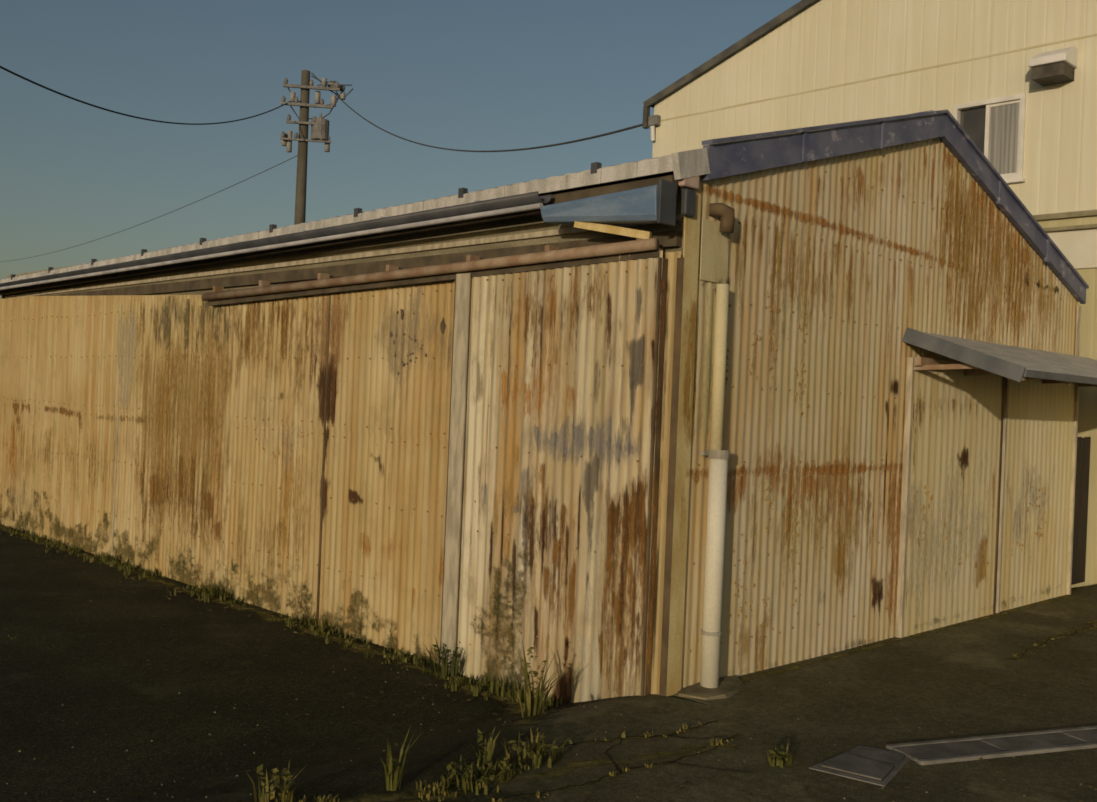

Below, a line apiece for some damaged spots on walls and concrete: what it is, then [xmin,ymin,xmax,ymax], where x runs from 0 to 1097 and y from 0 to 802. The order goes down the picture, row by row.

corrosion [702,149,1059,332]
corrosion [306,293,348,456]
corrosion [598,461,660,697]
corrosion [728,453,914,624]
corrosion [957,447,969,480]
corrosion [975,537,989,587]
crack [225,720,757,802]